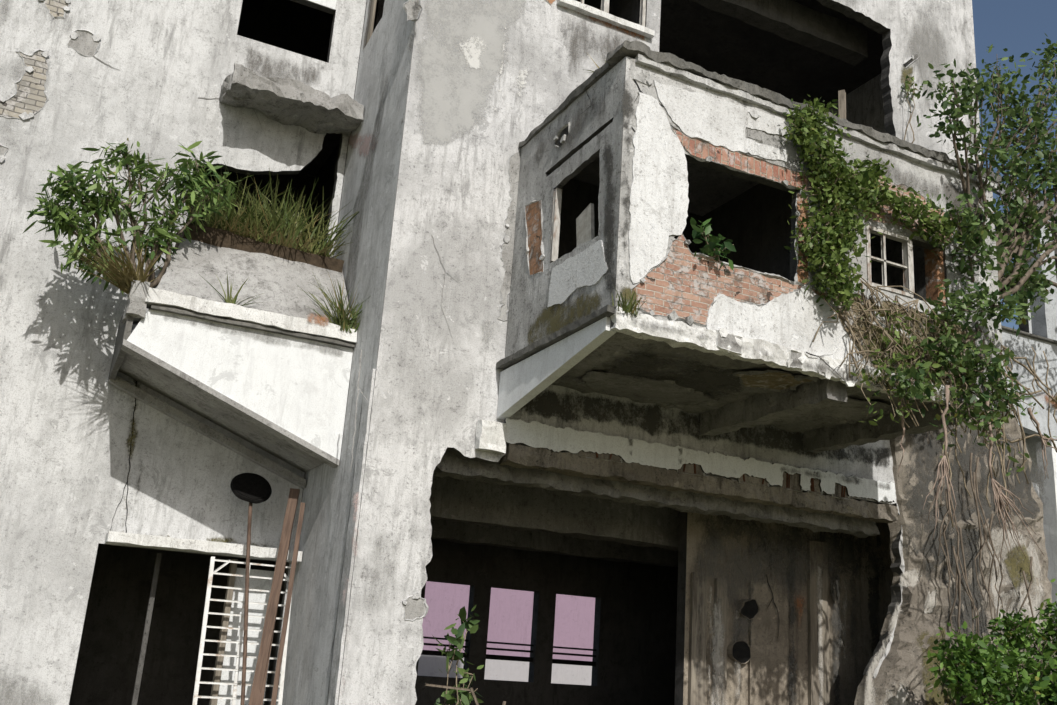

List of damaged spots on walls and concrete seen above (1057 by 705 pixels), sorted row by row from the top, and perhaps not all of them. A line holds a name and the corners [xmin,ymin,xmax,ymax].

spalling [0,49,49,121]
spalling [39,0,71,19]
spalling [67,29,101,57]
peeling [403,0,526,145]
spalling [554,122,571,148]
spalling [746,109,763,144]
peeling [497,150,545,321]
flaking render [628,125,978,393]
damp [519,349,890,466]
crack [105,381,137,546]
spalling [738,472,850,499]
spalling [402,593,429,622]